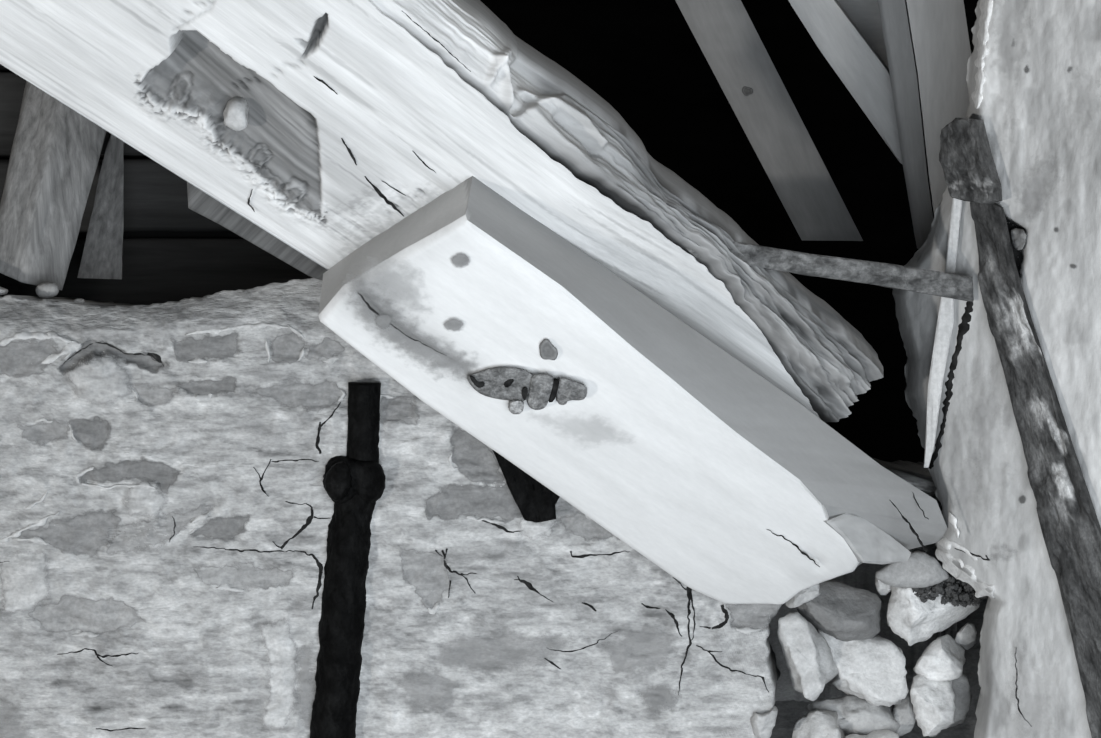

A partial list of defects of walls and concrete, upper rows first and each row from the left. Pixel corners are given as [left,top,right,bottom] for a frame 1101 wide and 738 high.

crack [341,138,406,217]
spalling [0,333,238,407]
crack [929,301,973,469]
crack [202,402,341,609]
crack [435,549,477,598]
crack [515,576,553,602]
crack [769,530,820,567]
crack [890,492,929,552]
crack [57,648,138,666]
crack [544,631,618,669]
crack [641,578,769,695]